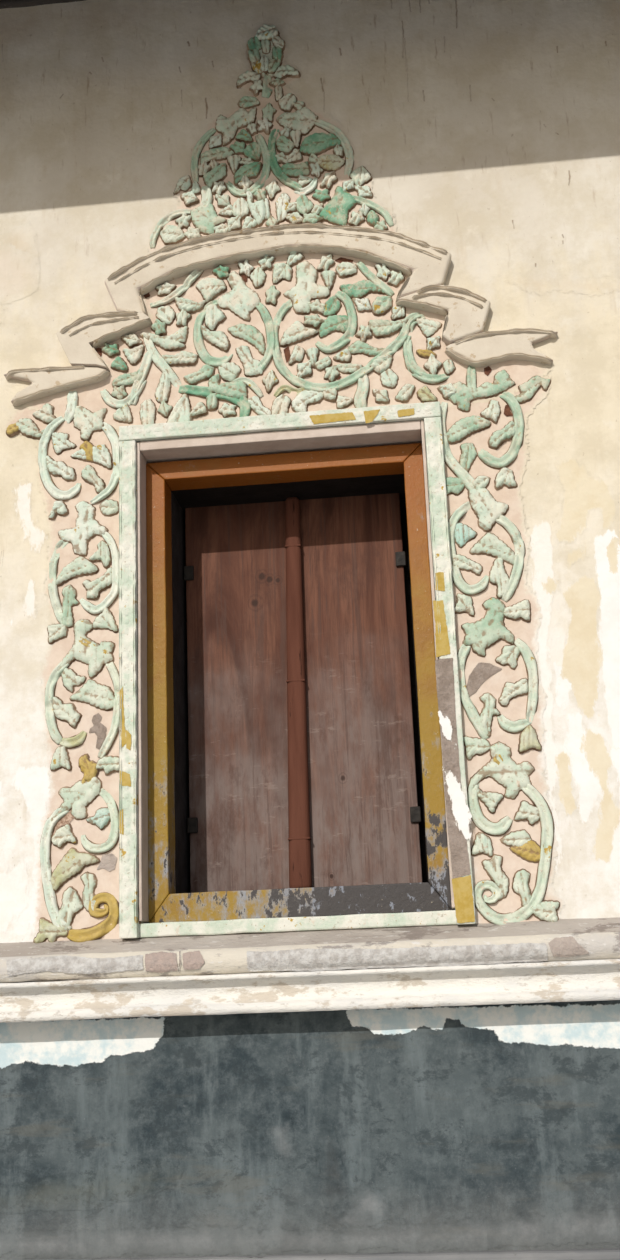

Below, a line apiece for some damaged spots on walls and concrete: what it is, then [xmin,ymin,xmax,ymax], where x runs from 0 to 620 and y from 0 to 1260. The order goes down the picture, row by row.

peeling [11,479,48,554]
peeling [529,520,620,878]
peeling [11,763,74,938]
peeling [0,1016,166,1069]
peeling [346,1003,620,1049]